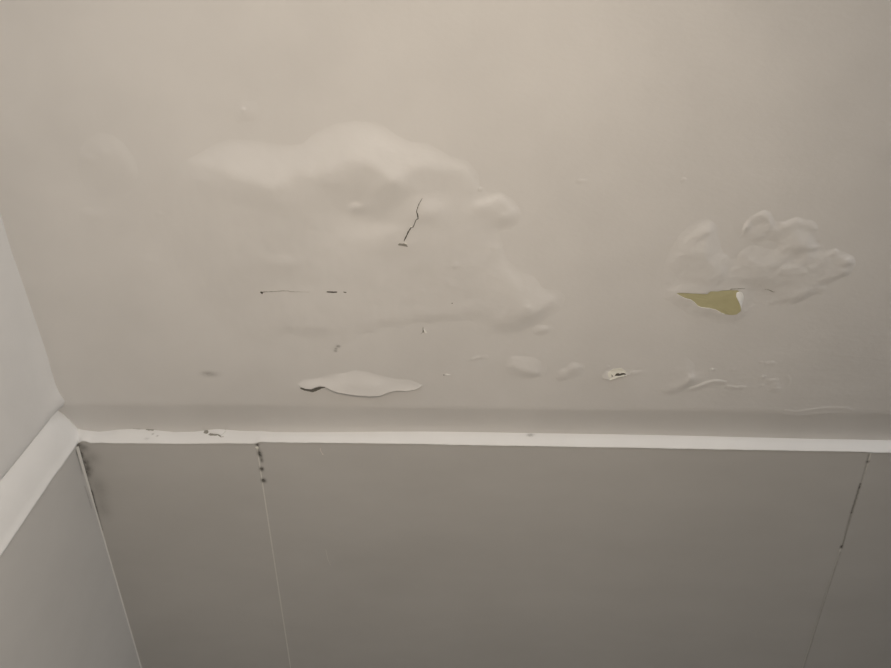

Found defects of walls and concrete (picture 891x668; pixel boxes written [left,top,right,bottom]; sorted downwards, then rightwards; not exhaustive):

crack [398,199,422,247]
peeling [677,288,745,315]